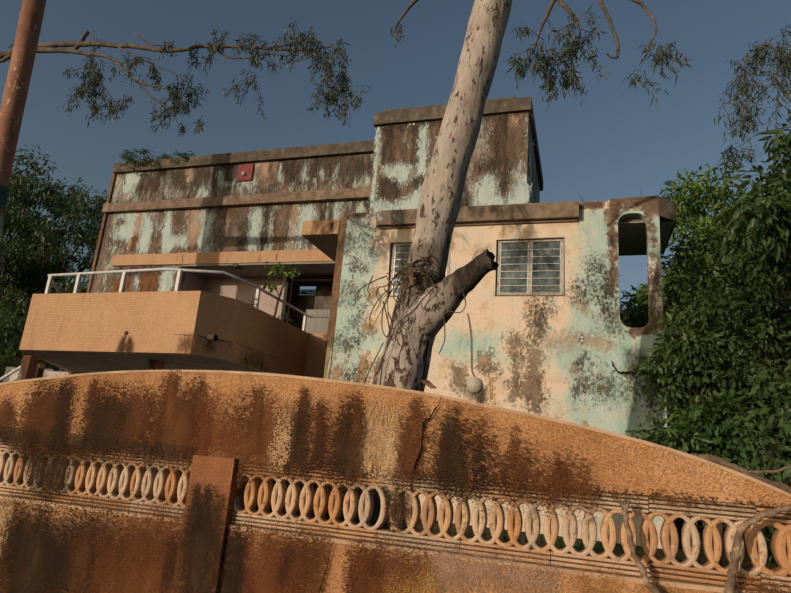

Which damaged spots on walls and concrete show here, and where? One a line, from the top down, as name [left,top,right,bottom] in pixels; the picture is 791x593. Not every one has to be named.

damp [116,164,240,202]
damp [478,158,508,194]
damp [238,218,252,252]
damp [256,205,274,251]
peeling [648,258,664,316]
peeling [361,317,378,340]
peeling [323,342,370,383]
peeling [448,331,611,417]
crack [410,396,442,492]
damp [234,349,776,519]
damp [0,365,249,593]
damp [340,536,563,593]